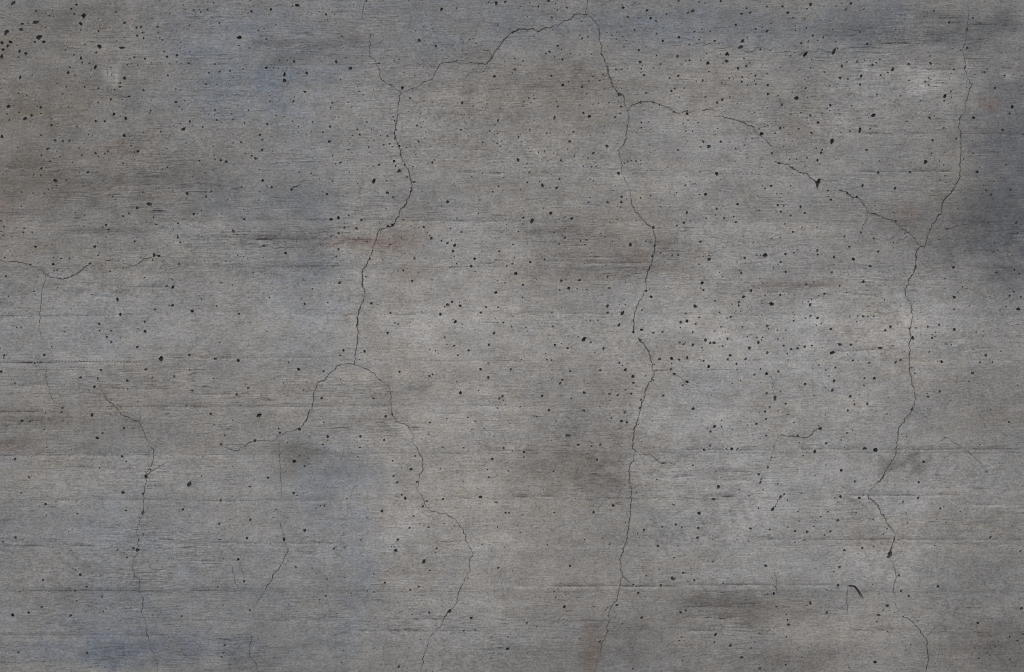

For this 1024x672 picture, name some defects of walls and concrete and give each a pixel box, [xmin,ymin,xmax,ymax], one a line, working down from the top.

crack [97,378,168,670]
crack [222,0,991,671]